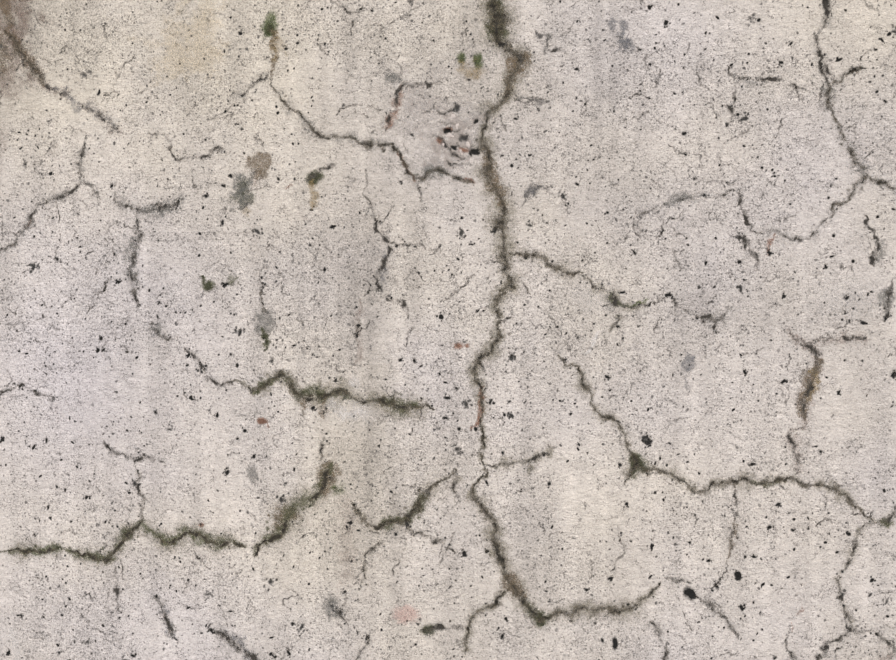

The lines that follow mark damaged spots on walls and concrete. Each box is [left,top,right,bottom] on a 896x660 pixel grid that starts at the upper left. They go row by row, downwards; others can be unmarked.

crack [4,31,147,130]
crack [1,133,434,432]
crack [252,0,896,660]
crack [2,438,342,613]
crack [156,582,189,643]
crack [209,596,257,660]